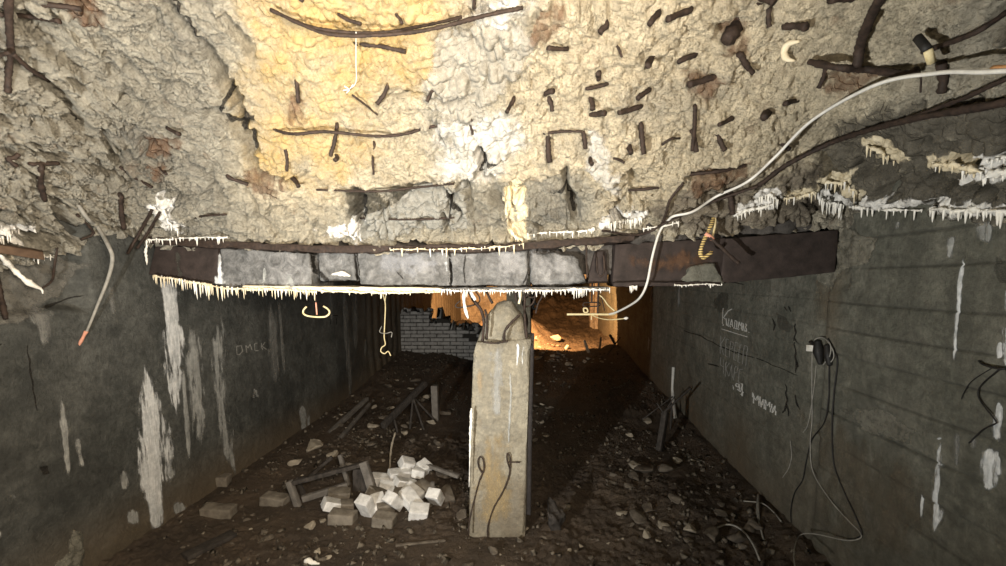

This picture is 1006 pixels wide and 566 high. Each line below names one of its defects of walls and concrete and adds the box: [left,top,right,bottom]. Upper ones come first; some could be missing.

spalling [0,0,62,94]
leakage [252,0,441,180]
spalling [270,0,538,138]
leakage [480,0,517,30]
spalling [807,0,921,78]
spalling [920,9,1006,55]
spalling [601,77,1006,236]
efflorescence [0,224,37,258]
spalling [126,209,161,254]
spalling [316,178,471,240]
spalling [0,254,88,324]
leakage [138,94,1006,530]